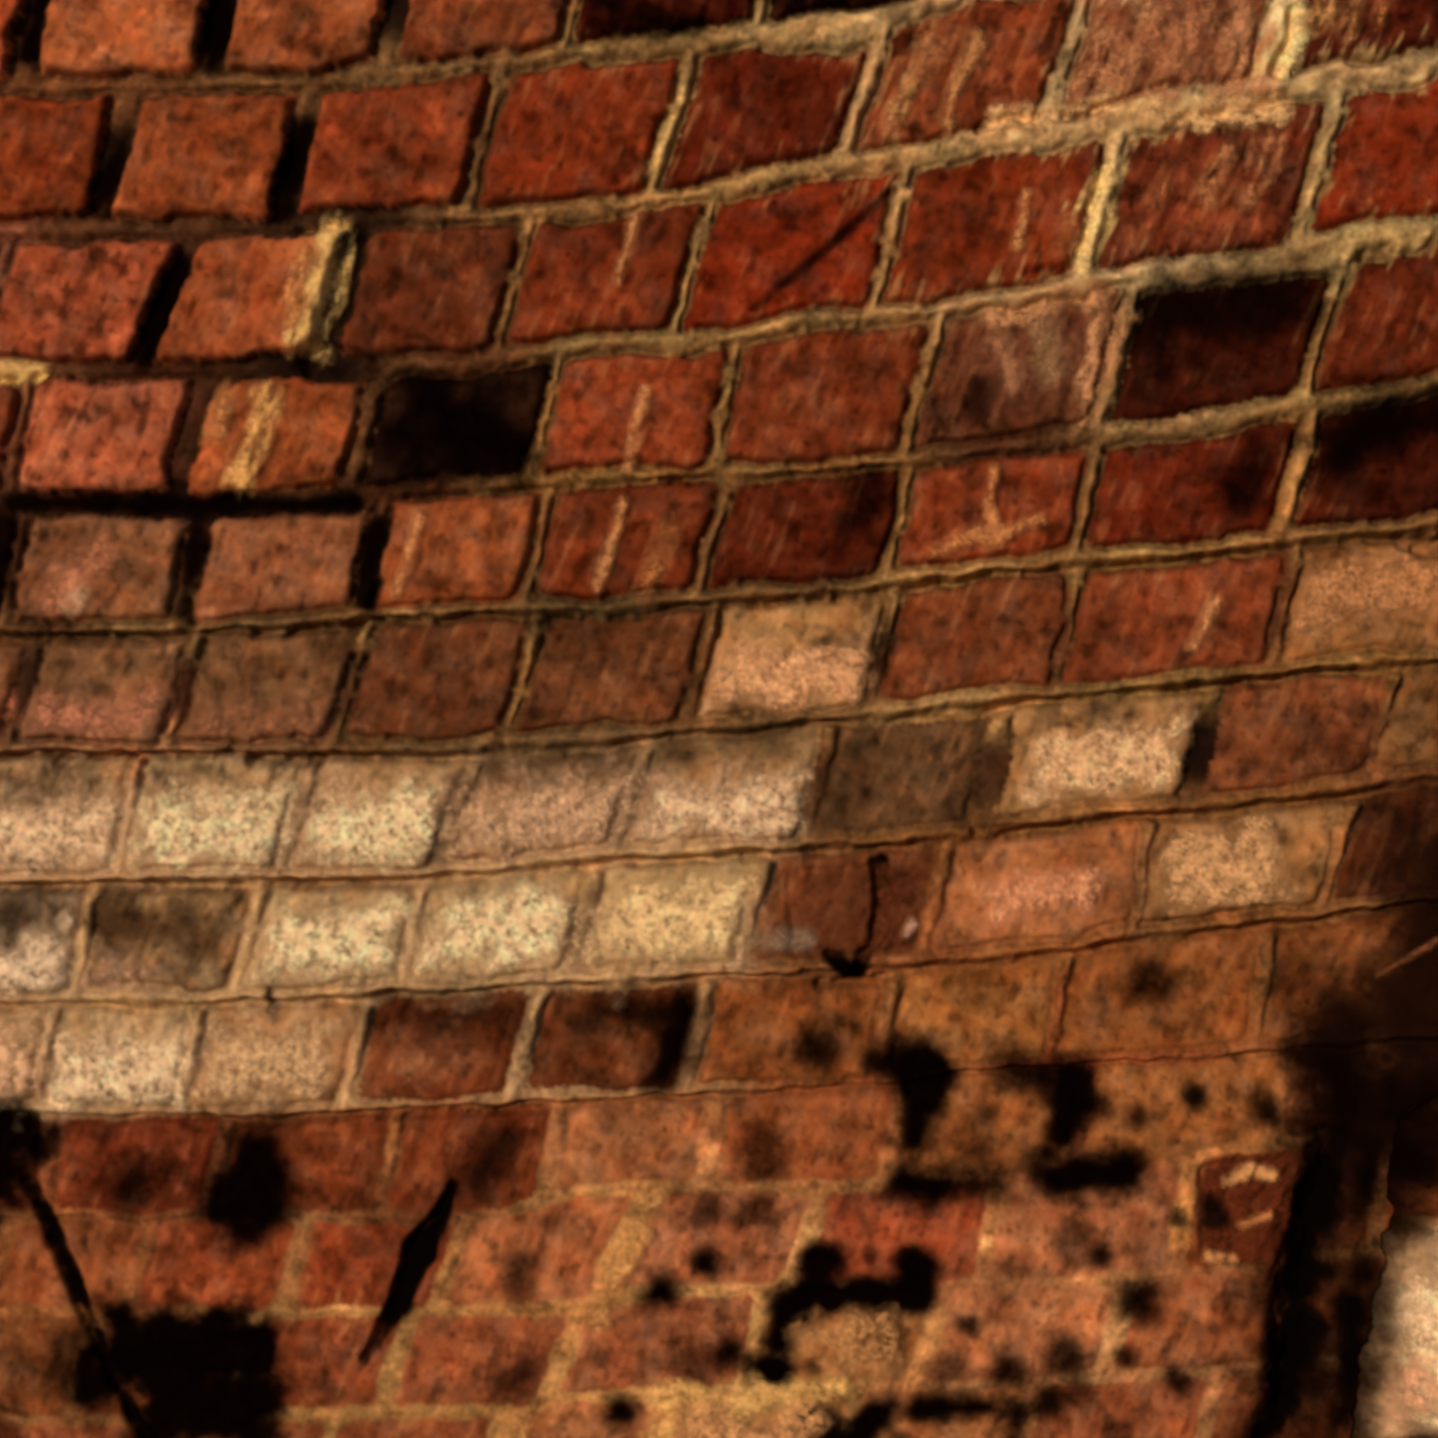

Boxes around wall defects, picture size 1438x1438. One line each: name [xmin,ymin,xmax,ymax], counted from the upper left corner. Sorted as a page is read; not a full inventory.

water stain [283,220,364,356]